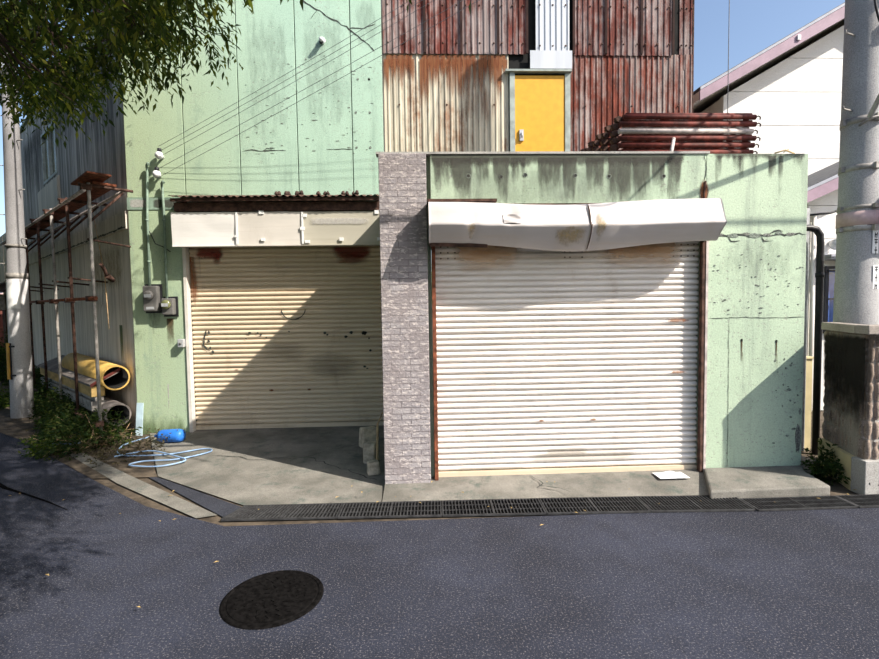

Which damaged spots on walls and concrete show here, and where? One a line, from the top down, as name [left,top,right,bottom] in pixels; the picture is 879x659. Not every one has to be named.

crack [303,0,374,51]
corrosion [384,54,507,95]
leakage [431,154,683,194]
leakage [715,154,804,172]
corrosion [190,248,222,299]
corrosion [334,247,369,262]
crack [720,230,805,242]
leakage [824,334,879,417]